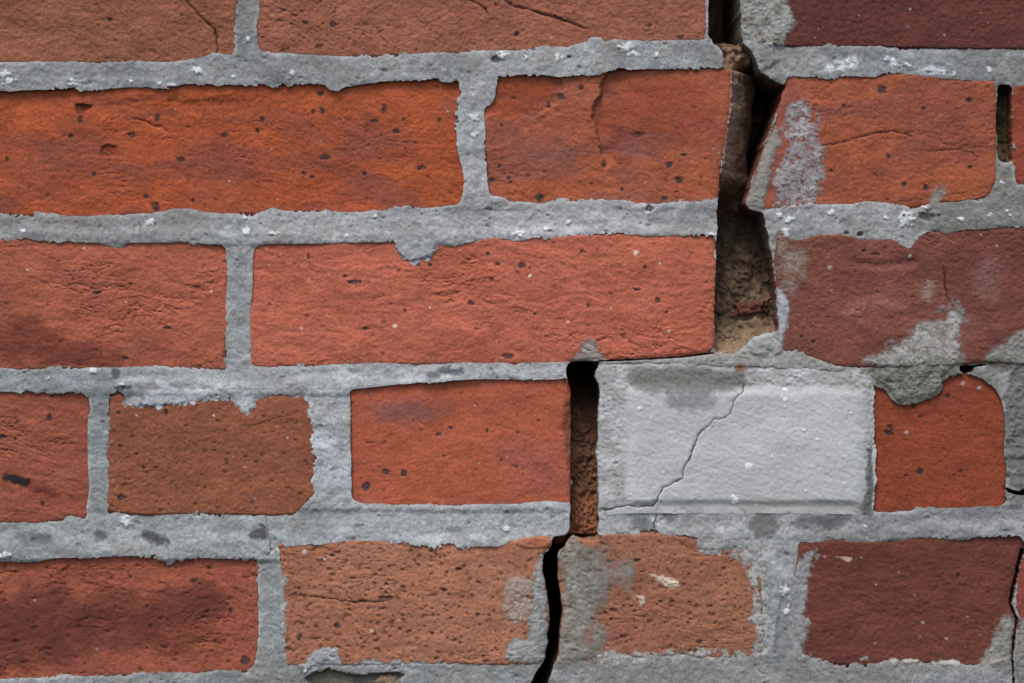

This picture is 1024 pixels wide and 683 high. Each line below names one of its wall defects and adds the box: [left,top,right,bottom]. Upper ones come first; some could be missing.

crack [530,0,775,683]
leakage [746,100,826,212]